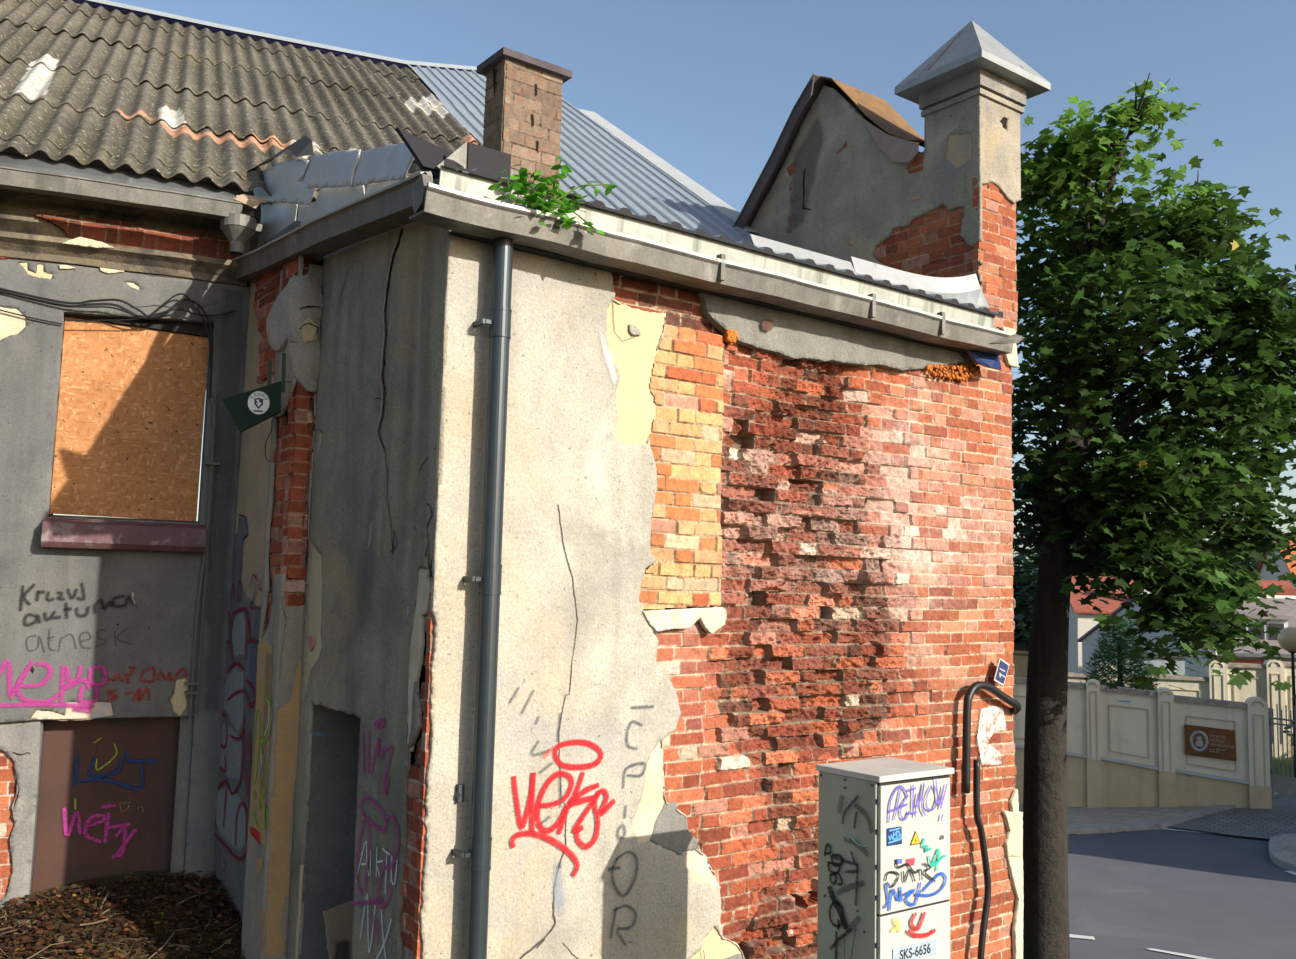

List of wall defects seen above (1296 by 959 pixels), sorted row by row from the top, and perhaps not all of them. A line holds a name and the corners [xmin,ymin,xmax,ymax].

flaking render [0,702,114,908]
flaking render [30,211,237,261]
flaking render [235,417,272,608]
spalling [244,268,283,392]
peeling [249,542,322,959]
crack [374,228,434,582]
spalling [400,568,434,959]
crack [519,504,579,959]
spalling [606,274,1024,959]
spalling [873,204,984,278]